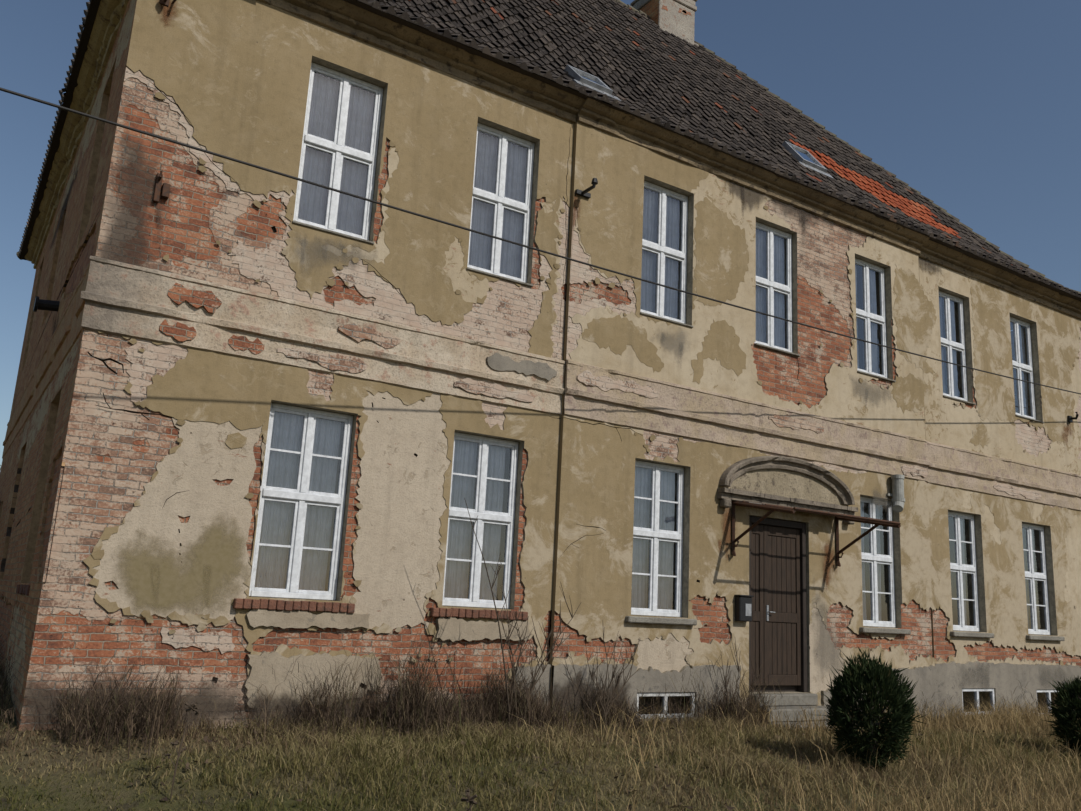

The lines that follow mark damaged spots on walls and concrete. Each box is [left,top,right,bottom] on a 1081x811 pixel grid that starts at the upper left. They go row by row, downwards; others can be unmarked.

peeling [51,0,1081,475]
crack [30,212,99,363]
crack [87,352,174,420]
flaking render [4,319,732,731]
peeling [901,465,927,483]
peeling [984,504,1001,545]
peeling [993,484,1063,508]
flaking render [809,599,1081,694]